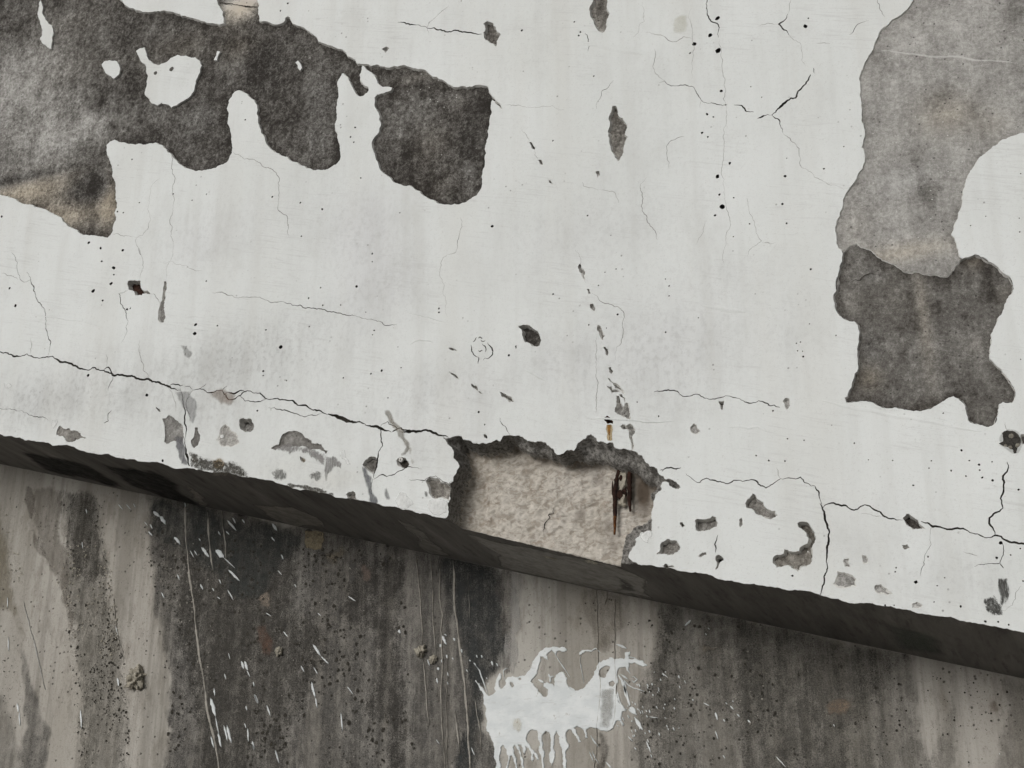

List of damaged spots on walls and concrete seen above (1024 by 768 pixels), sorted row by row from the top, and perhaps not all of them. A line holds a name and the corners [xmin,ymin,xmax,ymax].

crack [1,154,452,491]
peeling [0,0,502,285]
peeling [608,106,627,161]
crack [638,0,885,262]
peeling [833,0,1024,427]
damp [2,660,50,768]
peeling [271,431,327,463]
damp [25,453,652,768]
spalling [425,324,681,568]
crack [661,467,896,595]
peeling [773,521,816,577]
crack [921,463,1024,570]